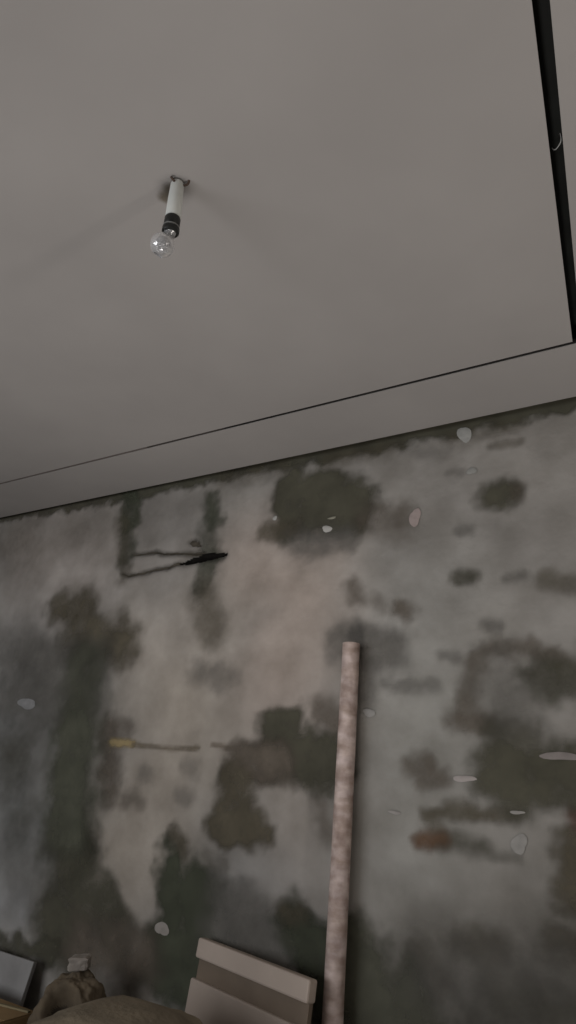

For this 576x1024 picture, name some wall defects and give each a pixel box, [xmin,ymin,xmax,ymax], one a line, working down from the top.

flaking render [457,427,471,443]
water stain [0,397,576,565]
crack [122,541,227,577]
water stain [314,704,339,734]
flaking render [539,752,576,760]
water stain [0,590,155,982]
water stain [453,643,576,916]
rust [422,804,513,820]
flaking render [155,922,169,936]